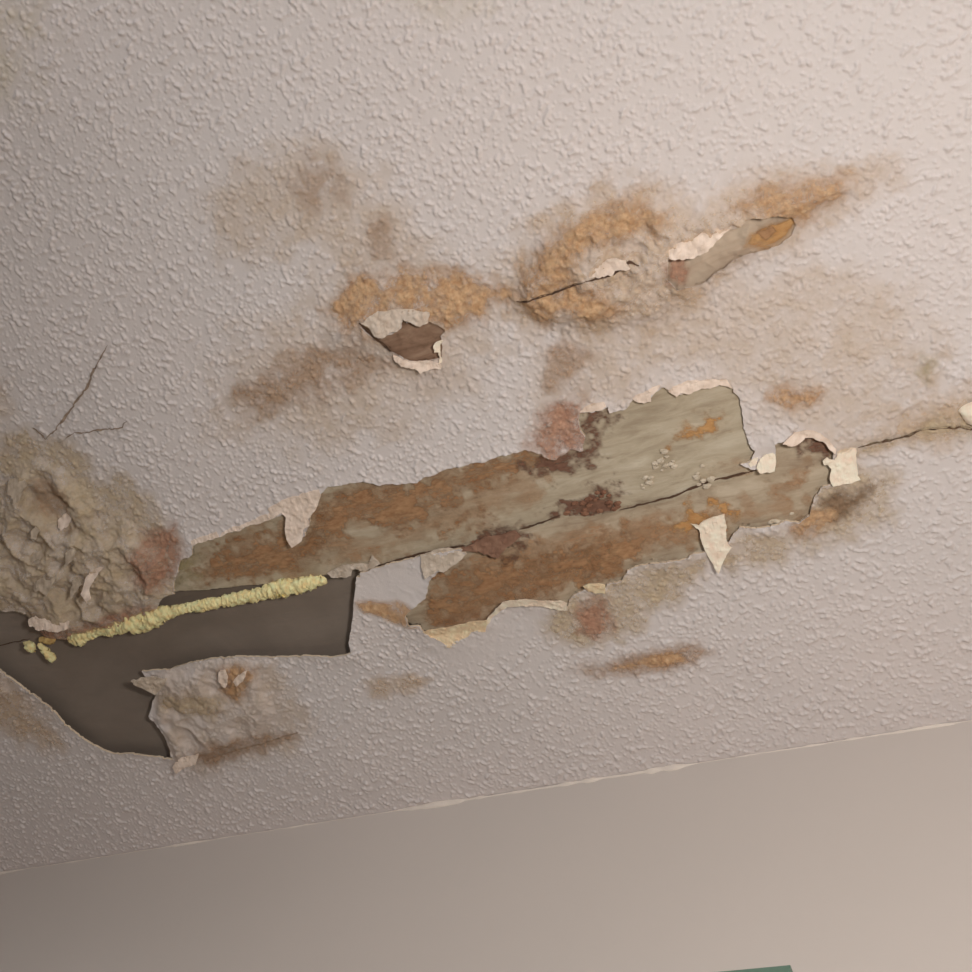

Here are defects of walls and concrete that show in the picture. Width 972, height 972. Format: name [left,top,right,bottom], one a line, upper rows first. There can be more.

damp [734,183,841,228]
damp [332,193,694,331]
crack [33,345,127,443]
crack [858,426,972,448]
damp [0,432,179,638]
flaking render [175,379,860,648]
flaking render [70,567,103,604]
flaking render [28,616,69,633]
flaking render [131,676,167,695]
flaking render [218,669,247,688]